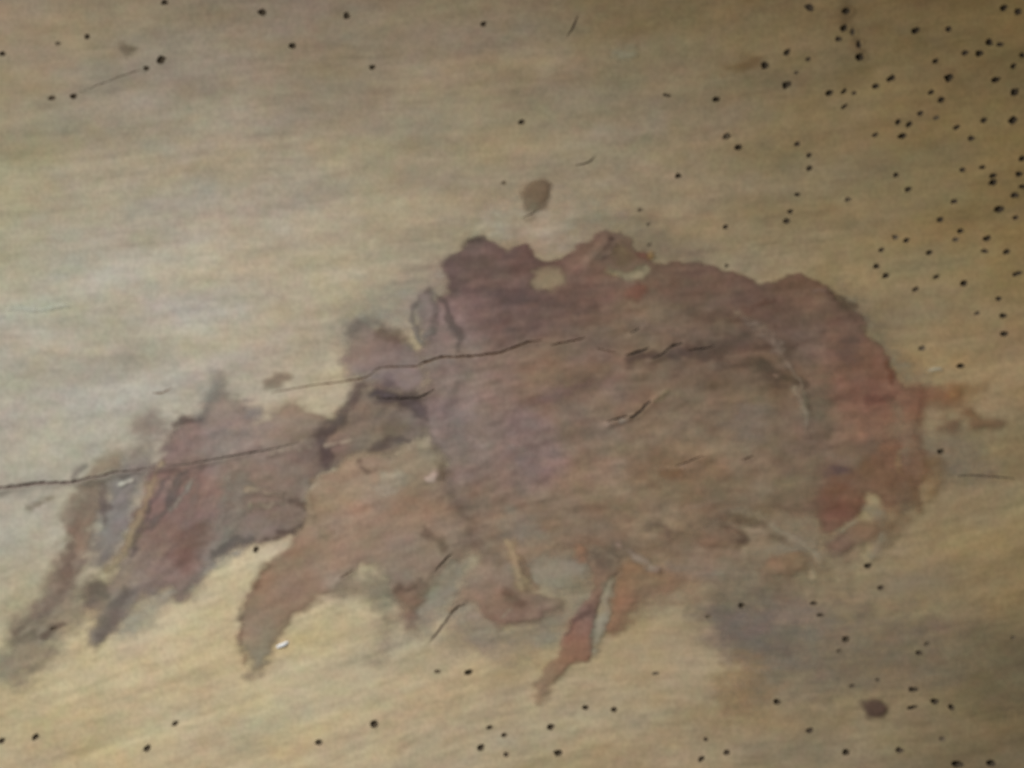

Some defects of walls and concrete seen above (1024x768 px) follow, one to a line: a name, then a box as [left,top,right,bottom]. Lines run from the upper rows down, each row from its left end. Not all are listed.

crack [271,327,714,400]
crack [0,442,299,490]
leakage [0,180,969,700]
crack [607,400,651,422]